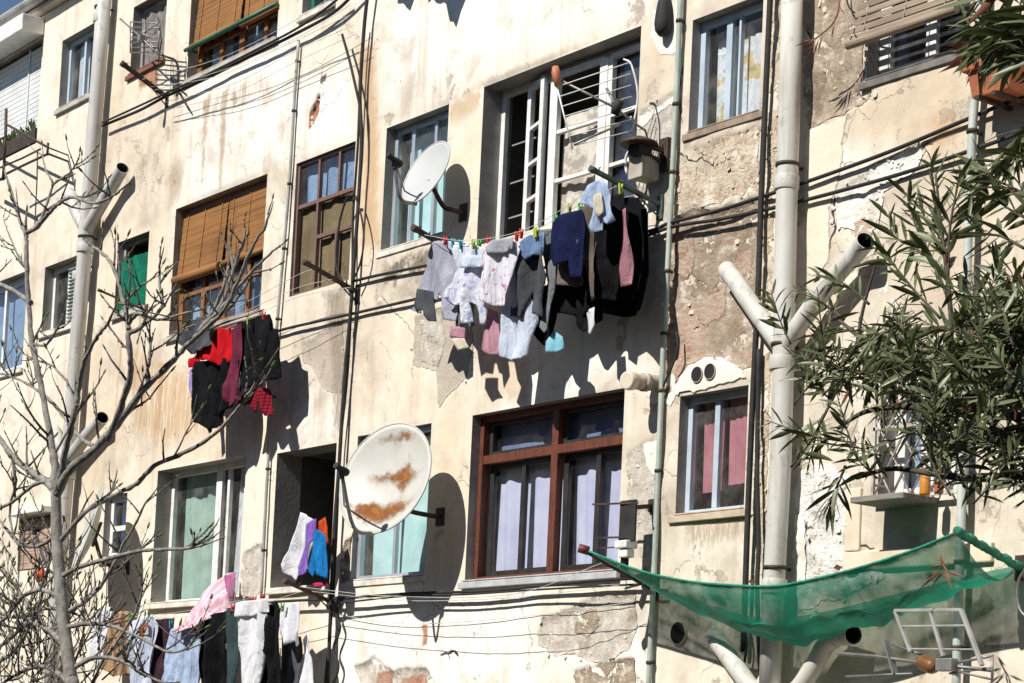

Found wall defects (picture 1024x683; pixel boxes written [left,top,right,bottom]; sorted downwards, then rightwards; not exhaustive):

flaking render [309,95,321,129]
peeling [829,137,925,238]
flaking render [630,0,781,577]
peeling [410,307,473,408]
peeling [792,464,861,582]
flaking render [354,658,432,683]
peeling [537,592,638,683]